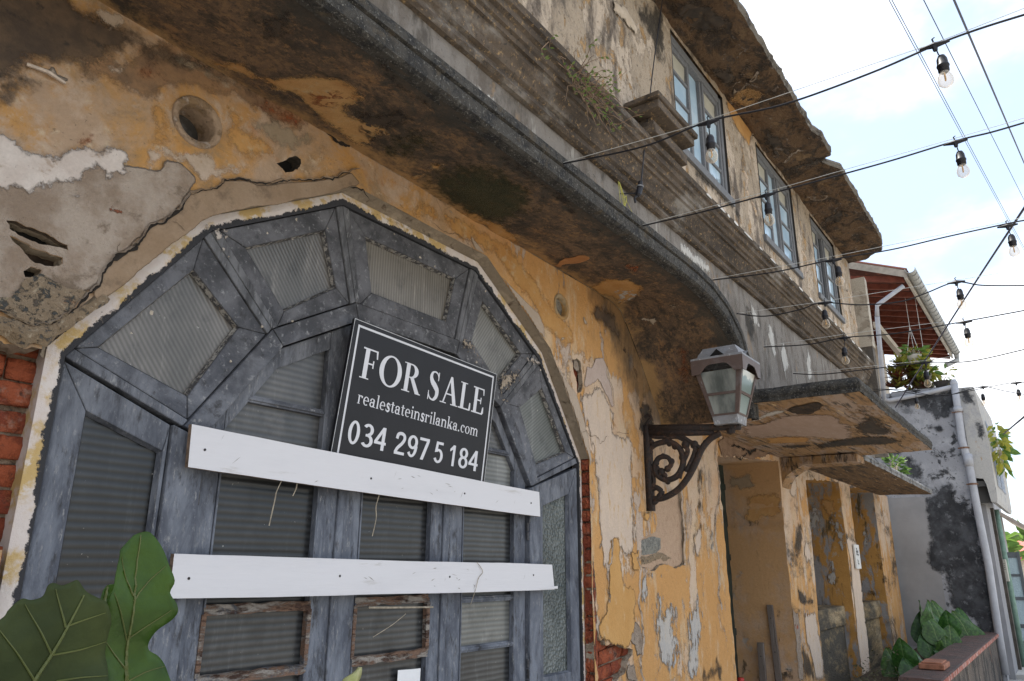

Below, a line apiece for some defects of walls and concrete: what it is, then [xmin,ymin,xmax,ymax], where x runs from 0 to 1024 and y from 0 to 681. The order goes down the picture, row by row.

water stain [0,0,310,150]
water stain [639,0,726,63]
flaking render [0,133,359,326]
crack [0,134,370,340]
water stain [424,158,575,227]
flaking render [503,278,546,340]
water stain [680,243,712,273]
peeling [744,411,852,439]
water stain [902,391,973,431]
peeling [558,358,715,681]
peeling [804,505,870,675]
water stain [925,468,994,632]